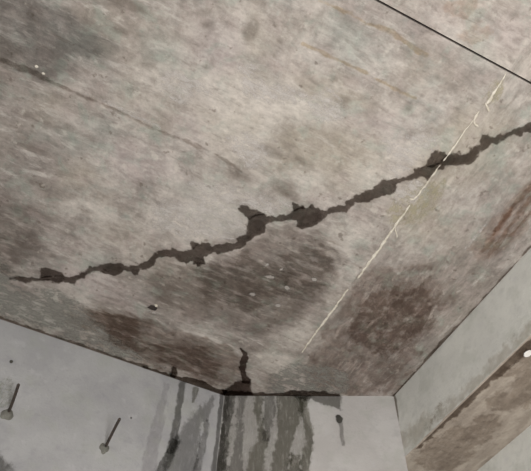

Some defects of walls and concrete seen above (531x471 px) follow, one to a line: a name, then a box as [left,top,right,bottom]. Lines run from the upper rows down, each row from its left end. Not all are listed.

crack [10,122,531,284]
crack [143,348,340,396]